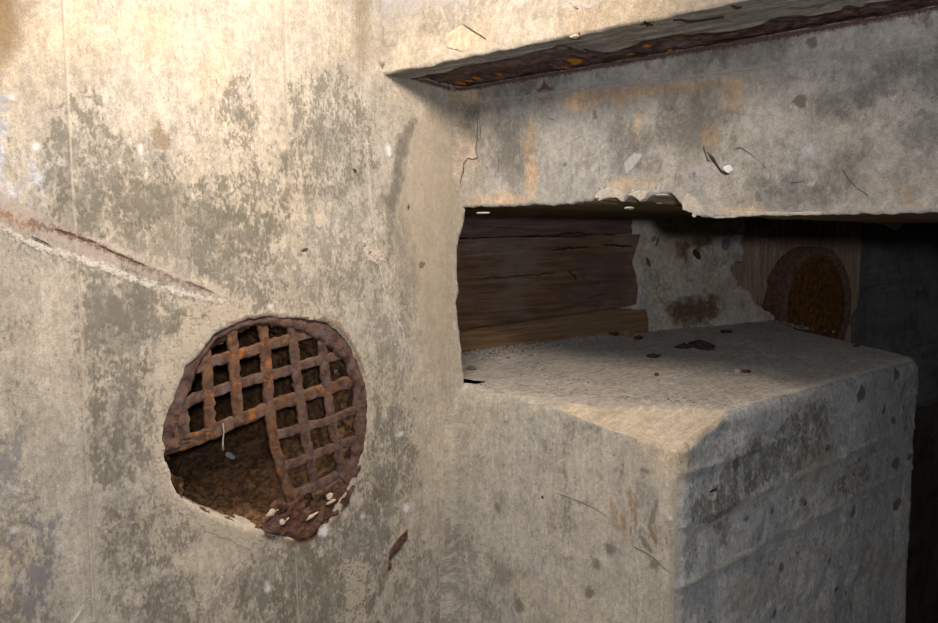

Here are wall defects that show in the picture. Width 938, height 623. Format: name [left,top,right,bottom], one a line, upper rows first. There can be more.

peeling [446,24,486,52]
rust [411,5,938,91]
crack [460,109,499,184]
peeling [595,185,660,202]
peeling [682,193,823,218]
crack [0,197,226,304]
rust [261,465,361,546]
rust [388,529,408,571]